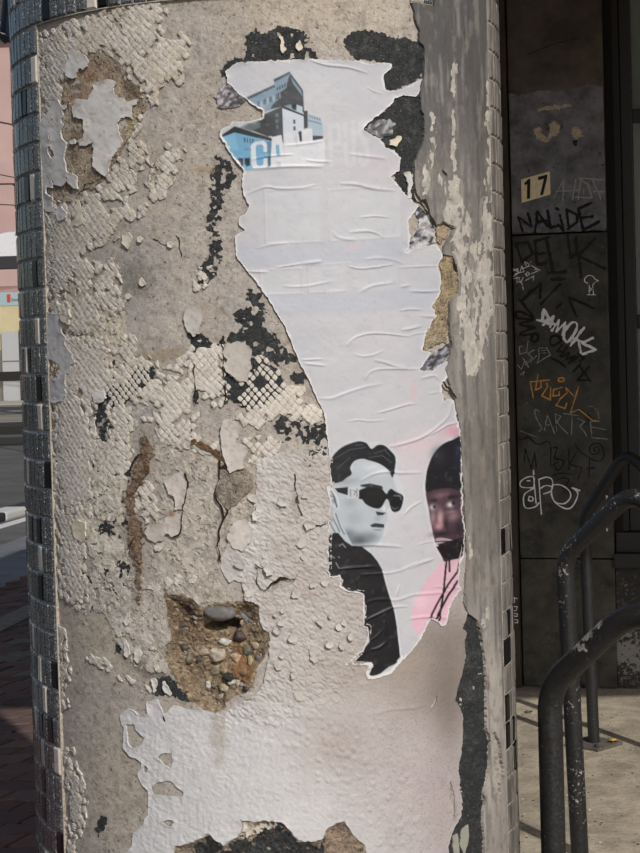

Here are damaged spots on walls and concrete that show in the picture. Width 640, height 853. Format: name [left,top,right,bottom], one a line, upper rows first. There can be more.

rust [121,436,155,604]
crack [173,473,189,537]
crack [214,460,229,562]
peeling [38,2,469,853]